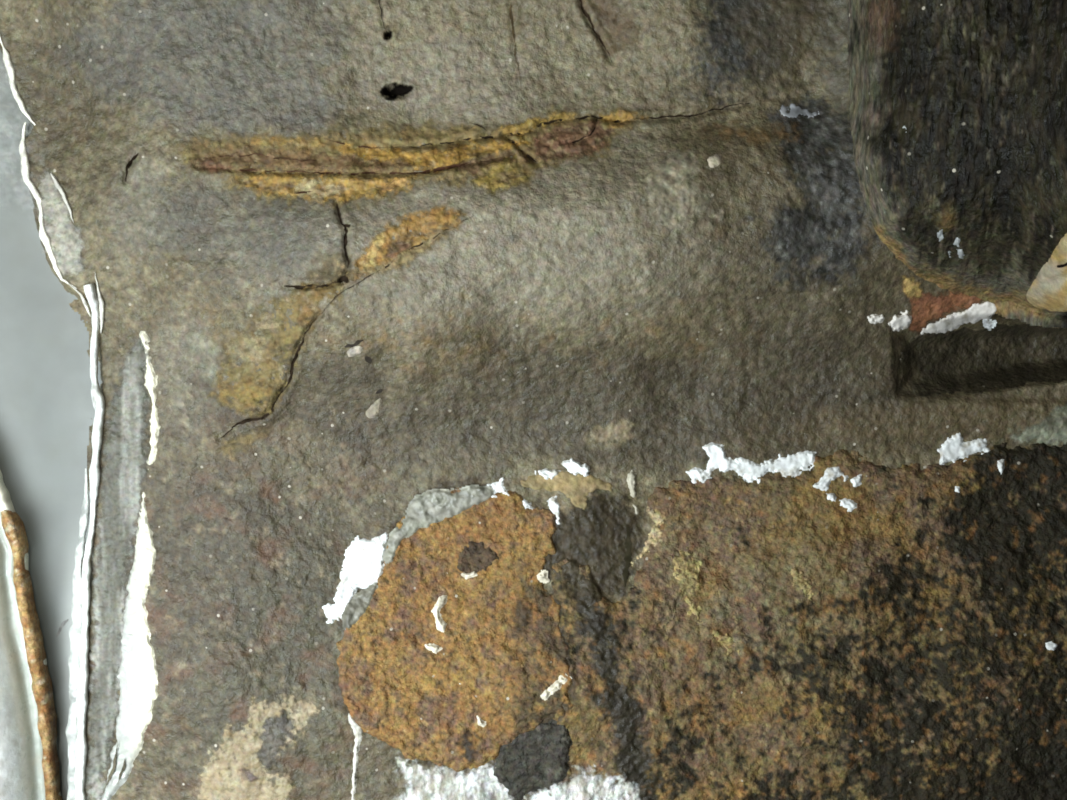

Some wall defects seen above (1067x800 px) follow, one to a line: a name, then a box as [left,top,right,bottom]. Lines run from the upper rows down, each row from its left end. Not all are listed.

crack [579,0,612,62]
peeling [0,36,105,333]
rust [179,107,643,206]
crack [197,103,749,194]
water stain [937,230,964,259]
rust [209,206,466,416]
crack [219,201,471,439]
peeling [867,302,997,335]
water stain [983,319,997,331]
water stain [622,525,632,587]
rust [1,510,63,800]
rust [336,478,580,773]